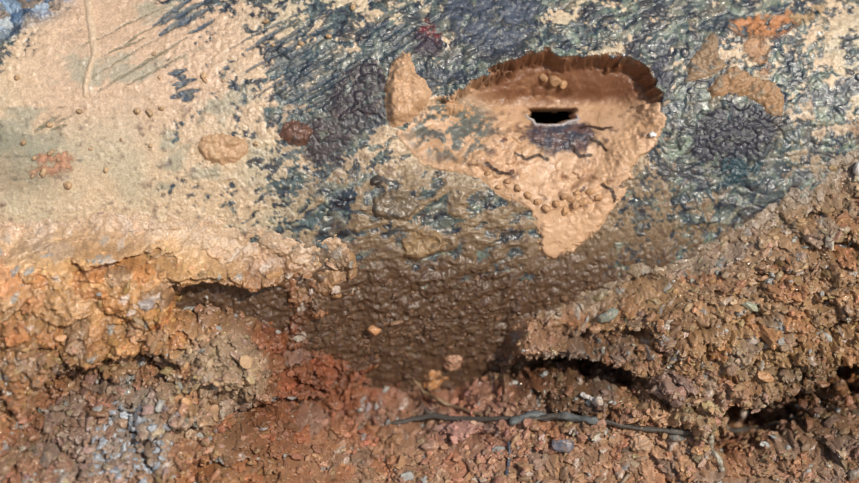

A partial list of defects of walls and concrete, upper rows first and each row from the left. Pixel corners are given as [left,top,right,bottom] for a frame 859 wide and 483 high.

spalling [396,0,676,259]
peeling [691,105,789,196]